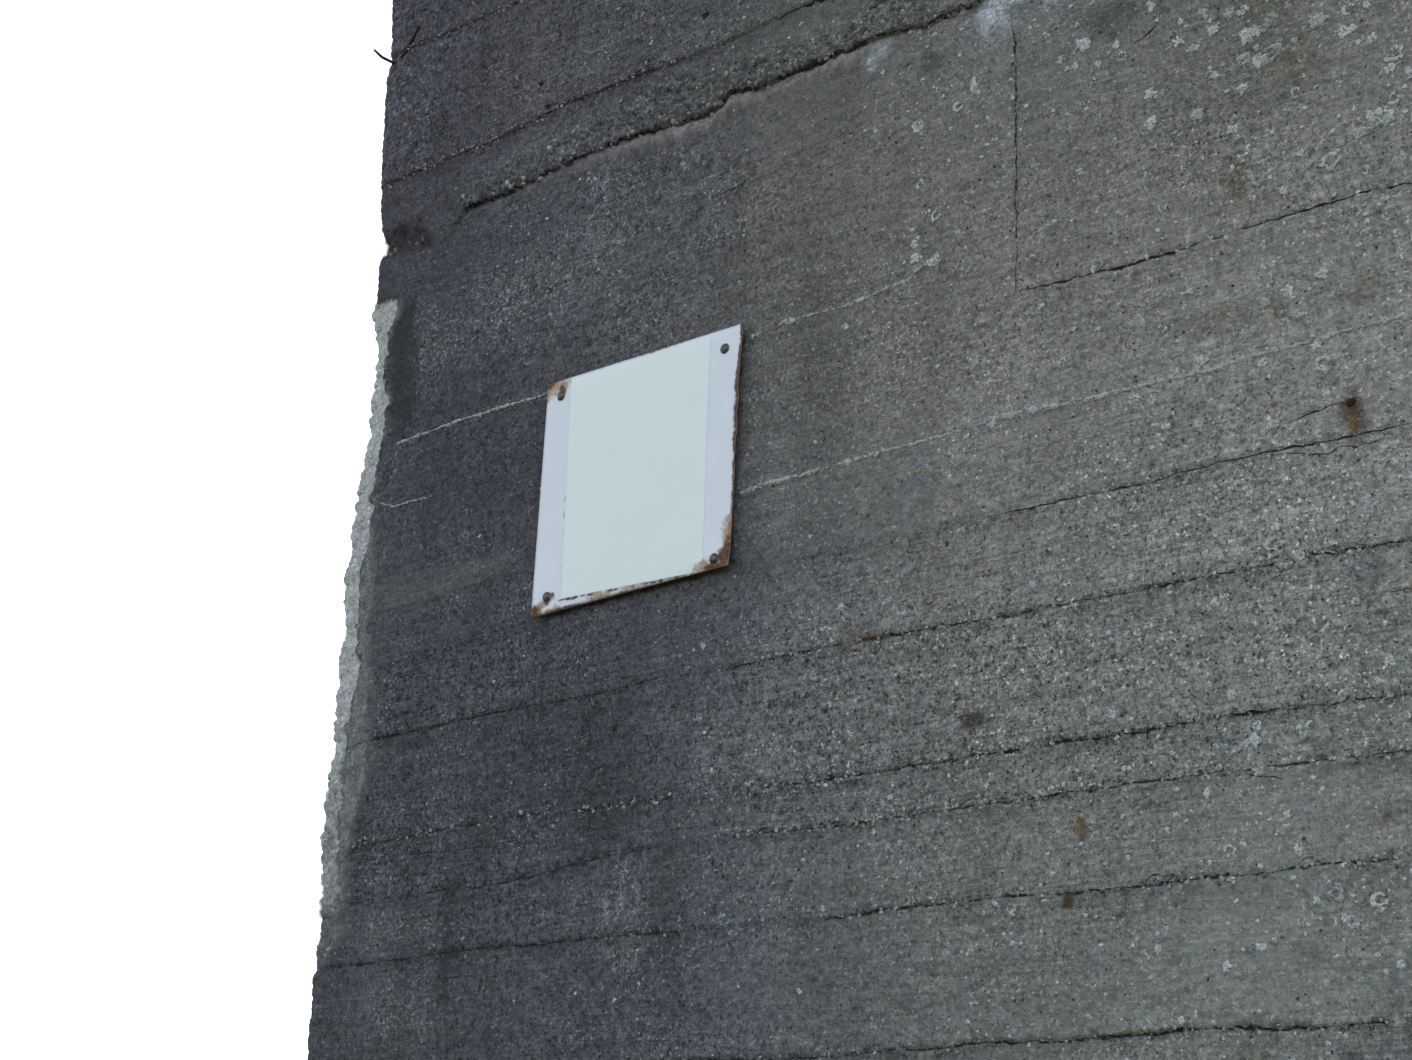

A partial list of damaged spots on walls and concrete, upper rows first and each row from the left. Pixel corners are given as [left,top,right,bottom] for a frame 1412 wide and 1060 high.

crack [402,0,523,52]
crack [381,54,684,189]
crack [464,0,1412,297]
spalling [316,297,402,960]
crack [727,537,1412,674]
crack [741,689,1409,794]
crack [746,745,1410,839]
crack [822,845,1412,922]
crack [319,931,671,969]
crack [683,1013,1412,1060]